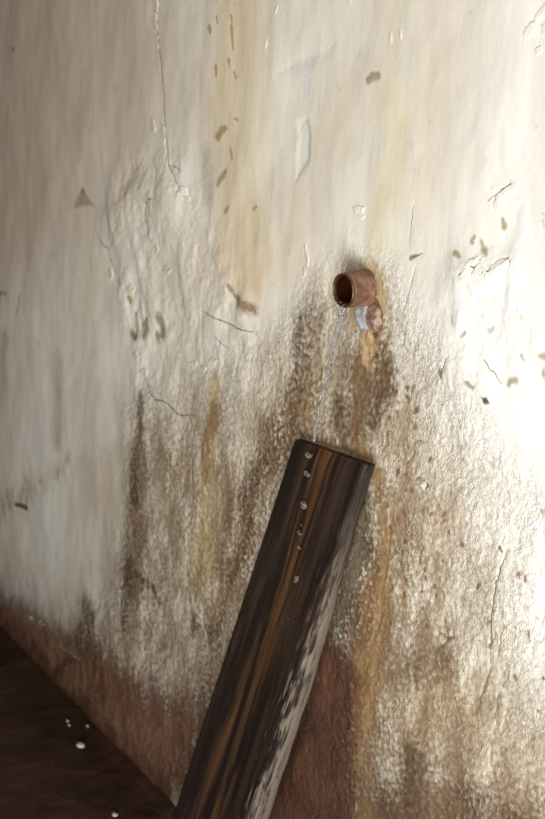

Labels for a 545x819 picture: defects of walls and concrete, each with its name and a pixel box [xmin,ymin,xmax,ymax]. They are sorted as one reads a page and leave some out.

damp [120,394,161,628]
damp [190,309,322,587]
damp [334,342,393,450]
rust [346,261,419,430]
damp [0,593,211,799]
damp [269,540,479,819]
crack [479,553,507,721]